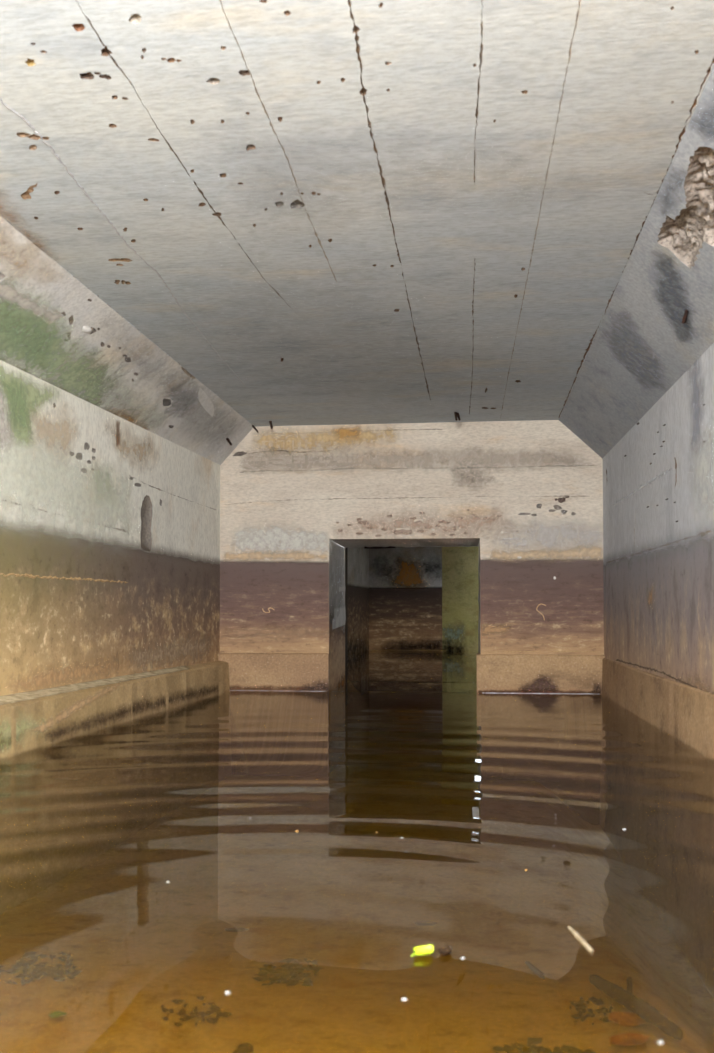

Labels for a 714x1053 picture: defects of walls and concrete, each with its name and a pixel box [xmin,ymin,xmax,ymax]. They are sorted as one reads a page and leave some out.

damp [0,285,60,321]
crack [76,0,297,314]
crack [220,0,337,282]
crack [348,0,431,400]
crack [474,4,483,182]
crack [559,58,714,418]
spalling [657,147,714,268]
damp [0,524,463,737]
damp [480,526,714,693]